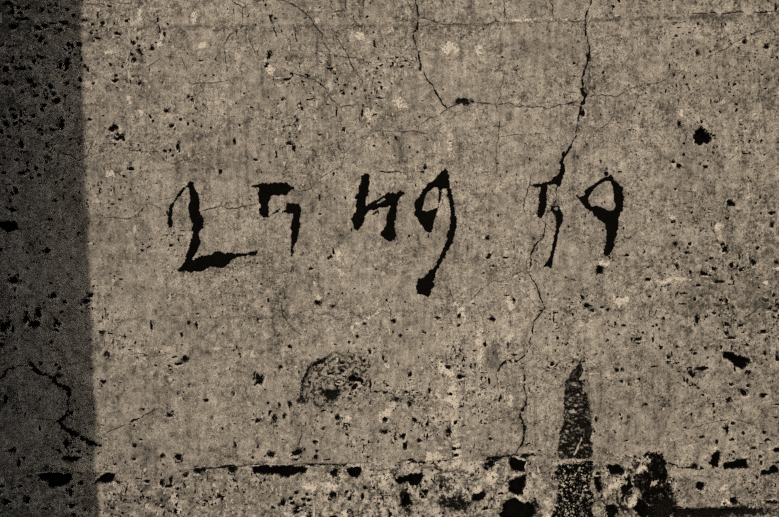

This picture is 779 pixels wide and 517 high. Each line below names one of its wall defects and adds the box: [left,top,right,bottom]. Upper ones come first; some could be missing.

crack [295,0,779,192]
crack [0,364,159,453]
crack [425,173,577,453]